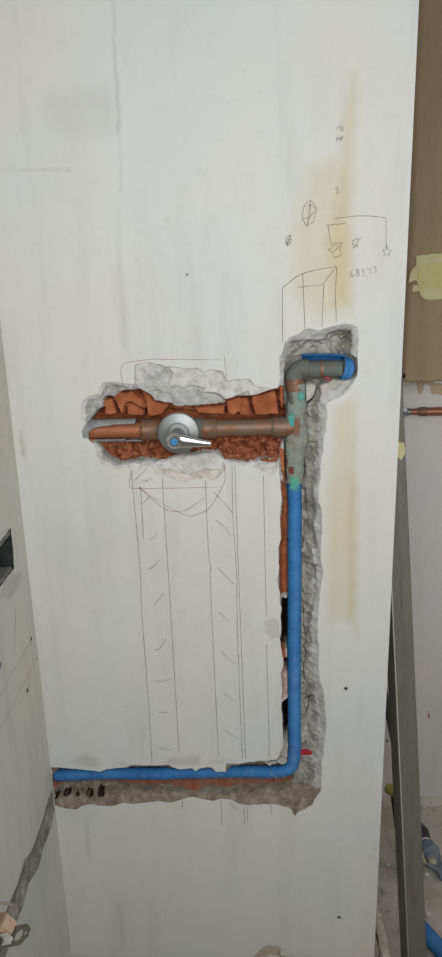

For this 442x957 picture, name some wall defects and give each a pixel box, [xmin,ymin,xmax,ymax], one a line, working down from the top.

spalling [81,323,359,428]
spalling [89,436,282,483]